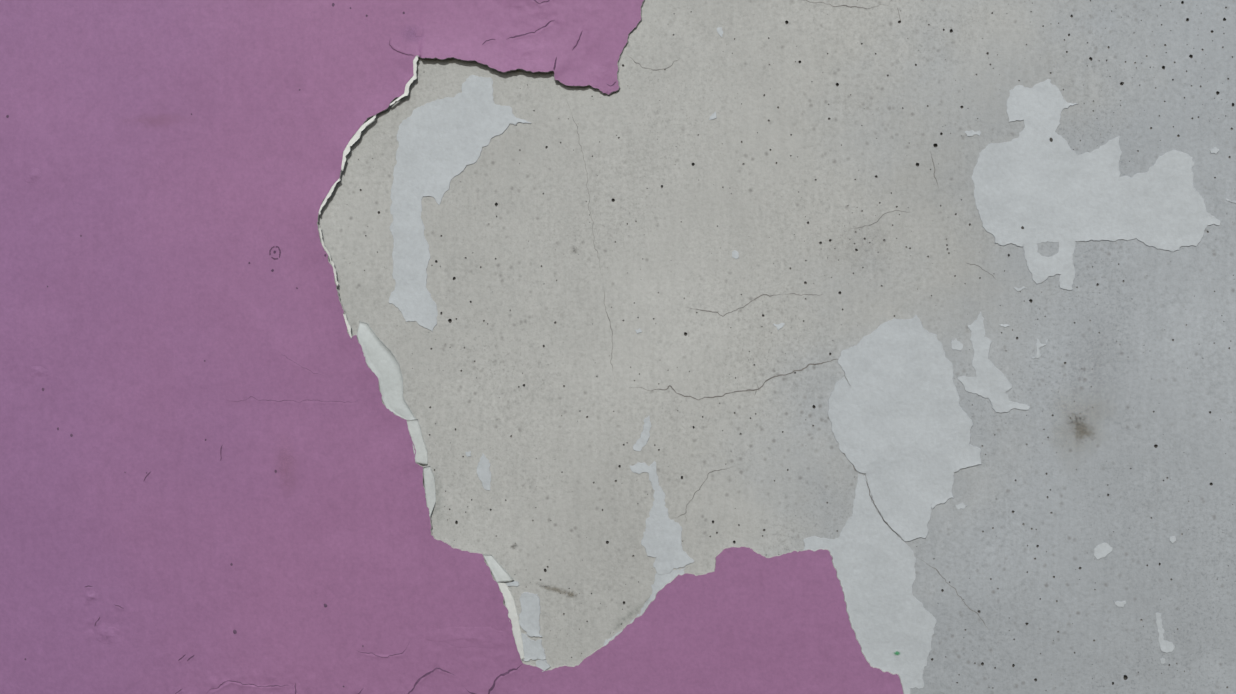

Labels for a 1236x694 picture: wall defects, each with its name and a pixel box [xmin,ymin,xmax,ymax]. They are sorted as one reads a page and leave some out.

peeling [0,0,937,694]
crack [567,102,850,400]